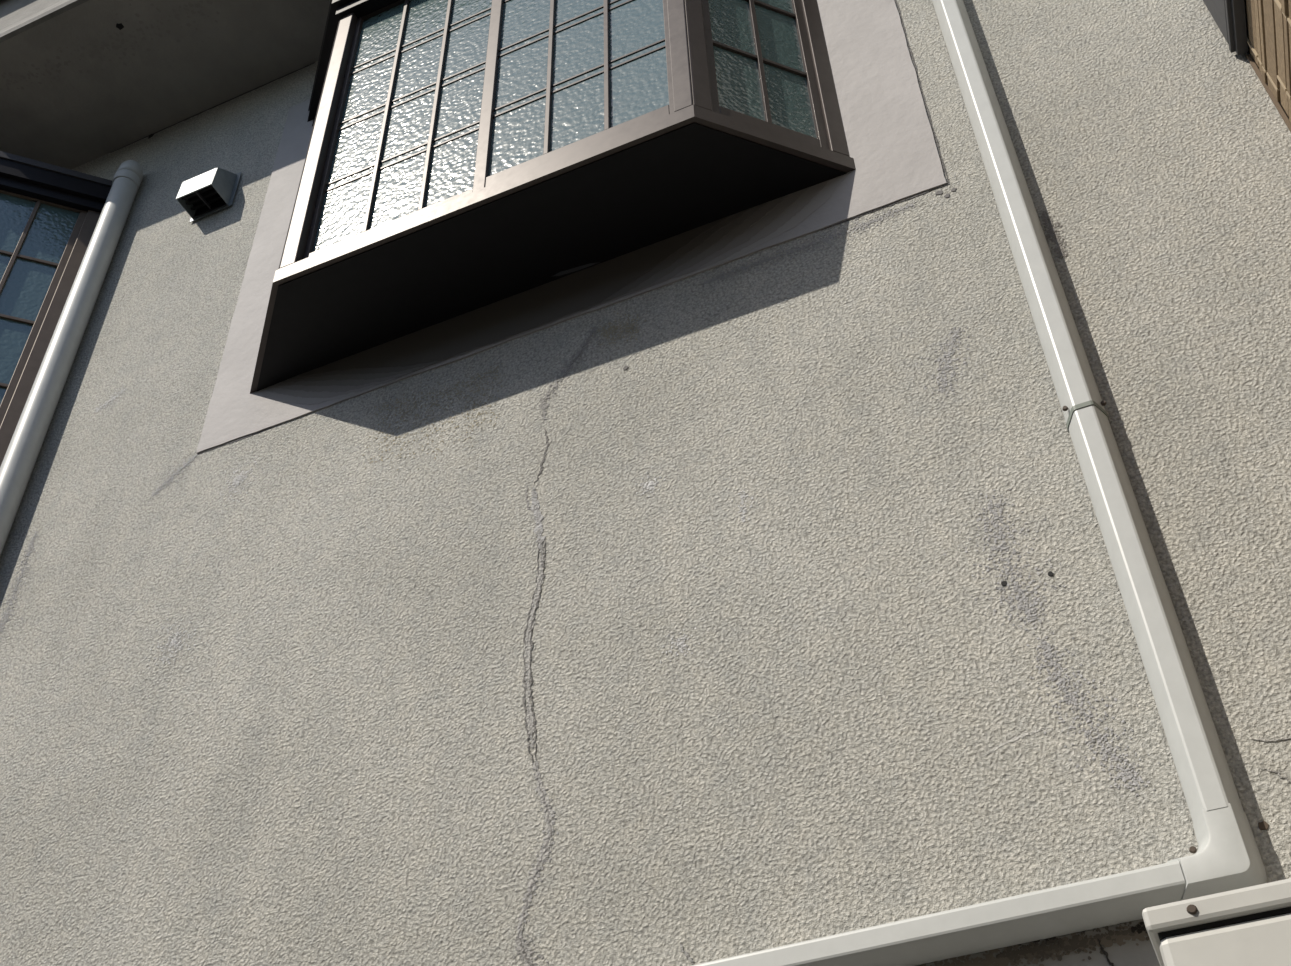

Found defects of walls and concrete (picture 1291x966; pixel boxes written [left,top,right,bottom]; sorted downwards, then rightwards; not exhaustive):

crack [518,331,594,966]